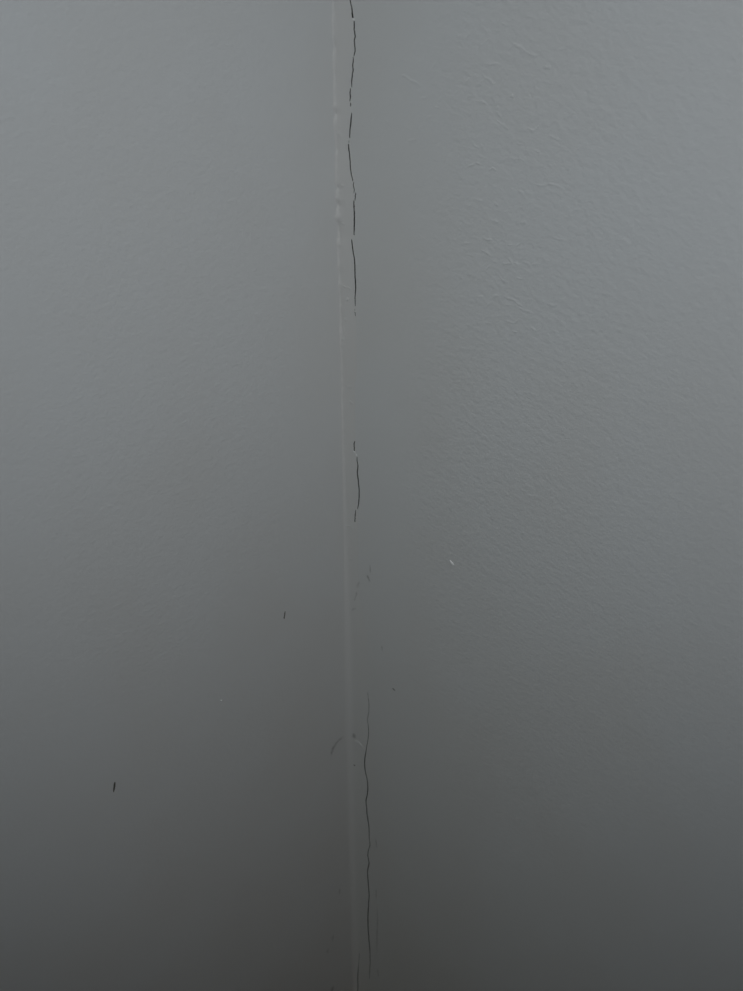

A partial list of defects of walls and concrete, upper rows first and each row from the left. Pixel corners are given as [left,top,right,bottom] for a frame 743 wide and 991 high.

crack [348,0,356,316]
crack [352,441,360,522]
crack [357,699,370,990]